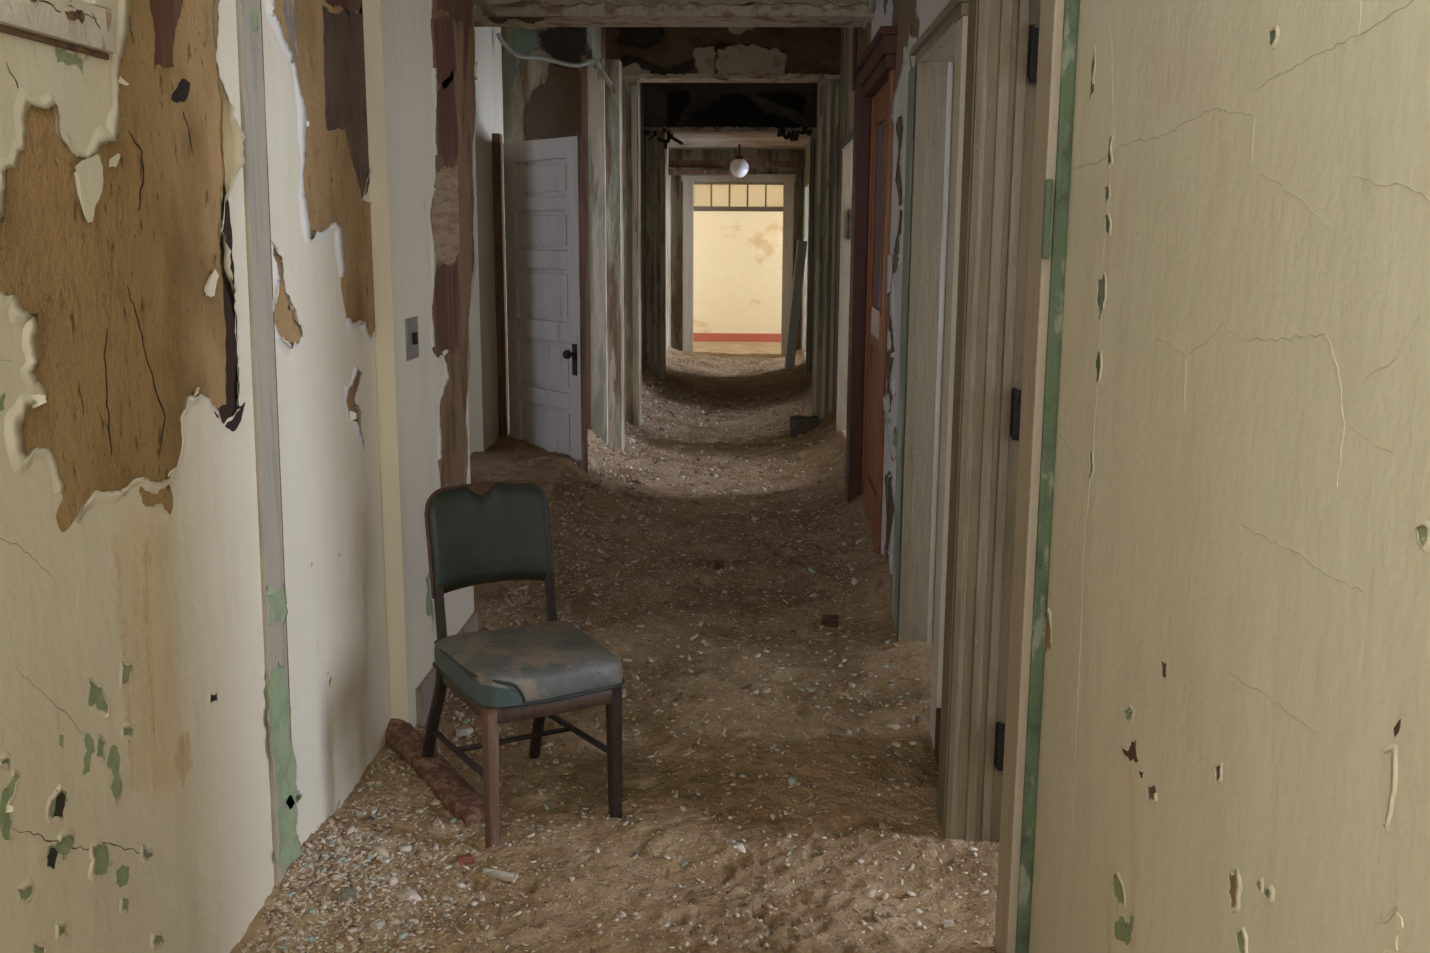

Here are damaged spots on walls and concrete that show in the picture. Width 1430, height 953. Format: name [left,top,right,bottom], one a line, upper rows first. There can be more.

flaking render [0,0,245,532]
flaking render [249,0,380,356]
flaking render [428,0,875,488]
flaking render [878,0,923,574]
crack [1071,0,1413,275]
crack [1157,316,1420,487]
peeling [45,784,153,915]
peeling [82,660,135,806]
peeling [268,659,319,877]
crack [1060,384,1098,842]
spalling [1121,704,1158,804]
peeling [1228,867,1276,953]